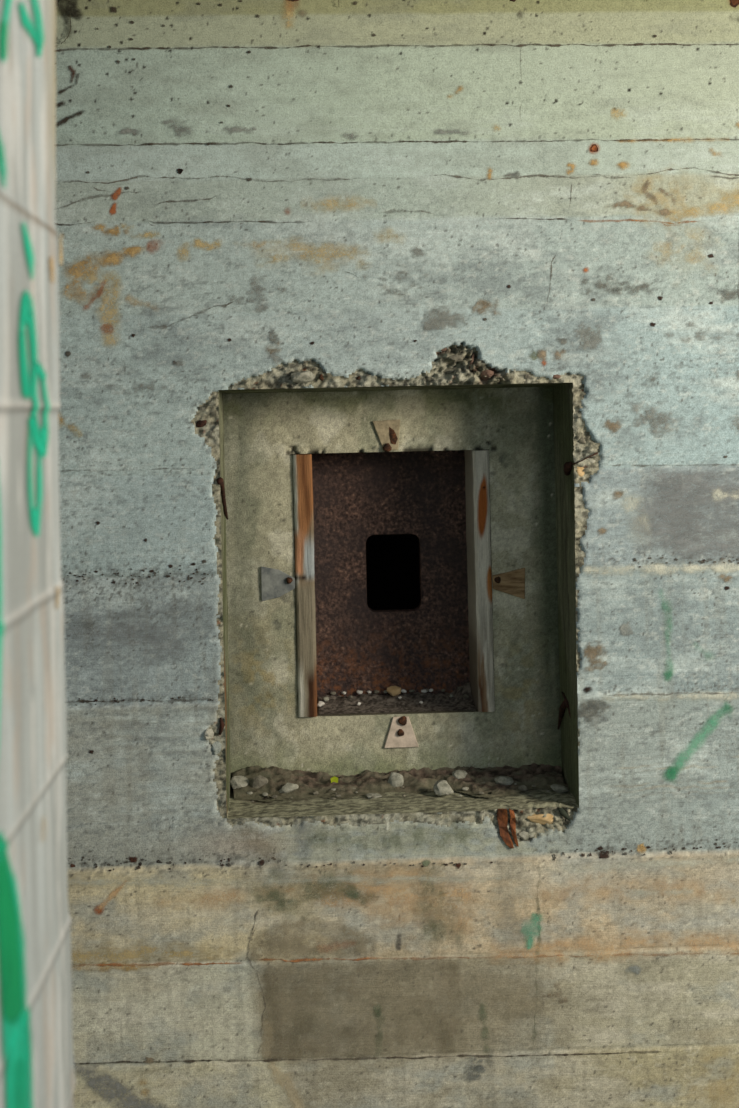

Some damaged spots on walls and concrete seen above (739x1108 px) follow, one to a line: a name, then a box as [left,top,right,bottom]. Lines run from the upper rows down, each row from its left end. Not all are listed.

rust [110,188,121,214]
rust [50,232,156,344]
spalling [67,330,610,818]
rust [497,809,519,848]